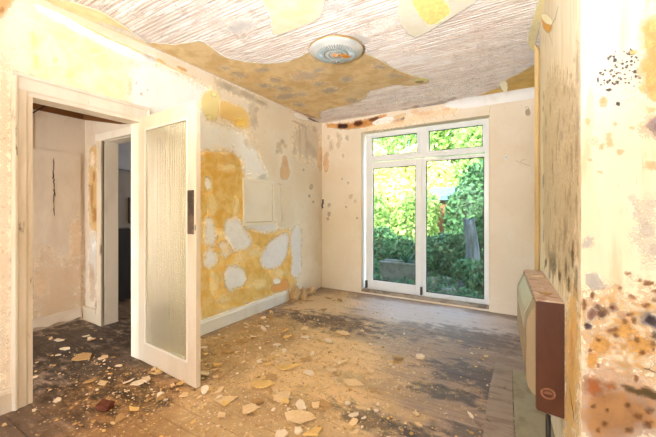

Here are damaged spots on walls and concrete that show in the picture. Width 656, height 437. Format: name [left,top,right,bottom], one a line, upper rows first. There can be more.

peeling [374,0,477,38]
peeling [527,0,558,51]
leakage [597,15,656,138]
crack [49,159,57,216]
flaking render [35,0,431,320]
leakage [543,67,656,437]